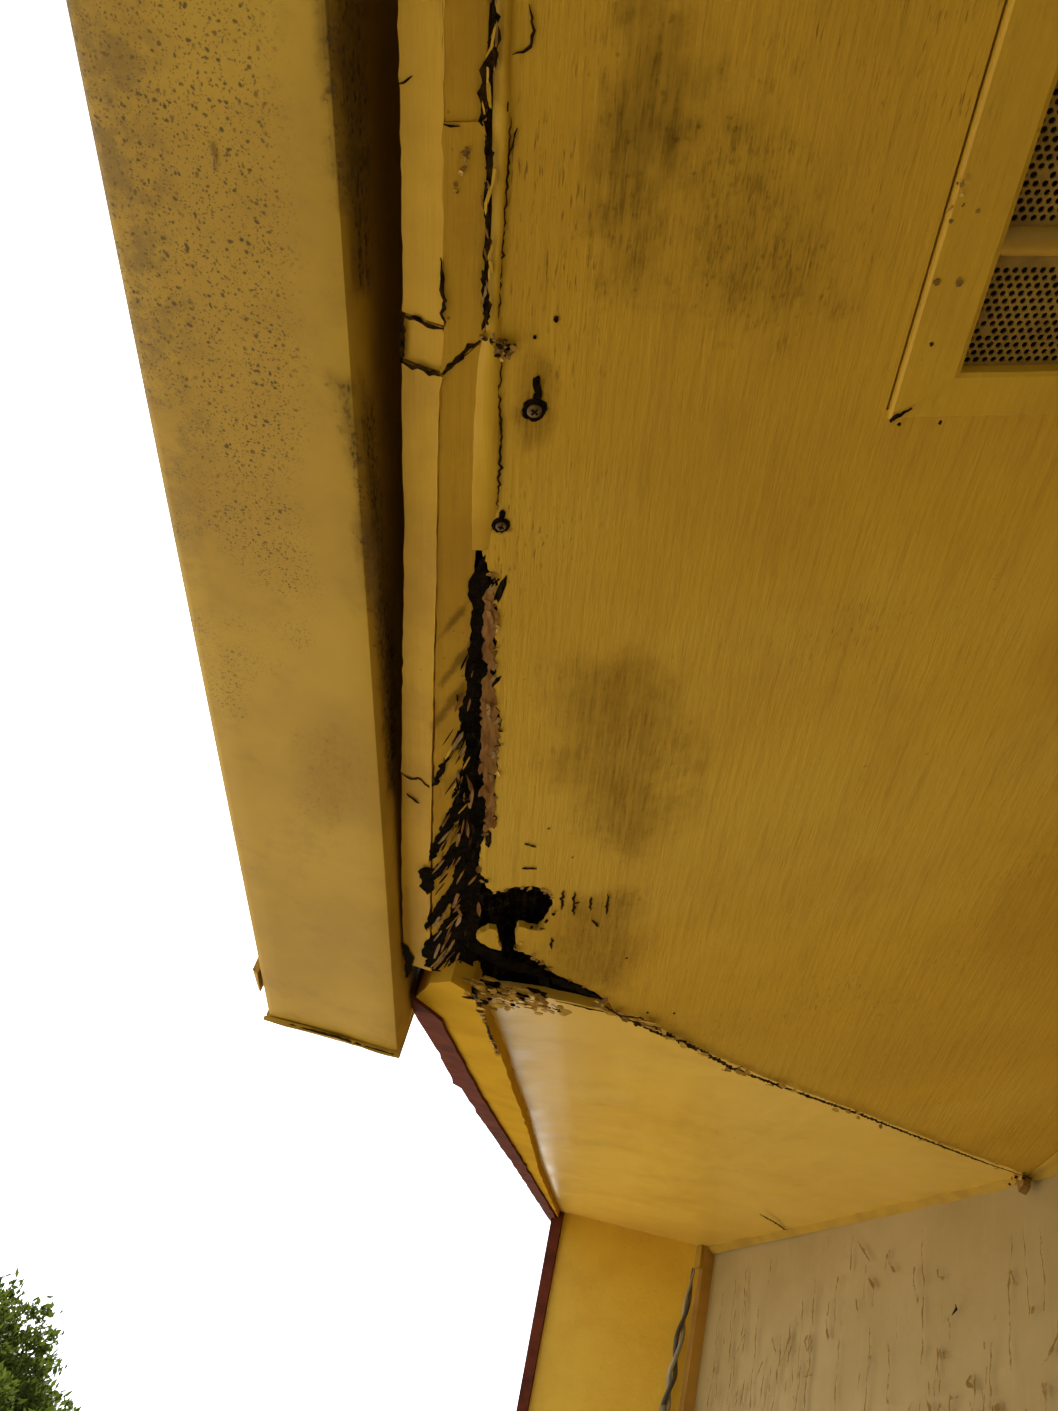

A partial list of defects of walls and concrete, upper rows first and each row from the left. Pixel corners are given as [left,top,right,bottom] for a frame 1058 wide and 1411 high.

crack [399,0,536,507]
peeling [478,580,501,831]